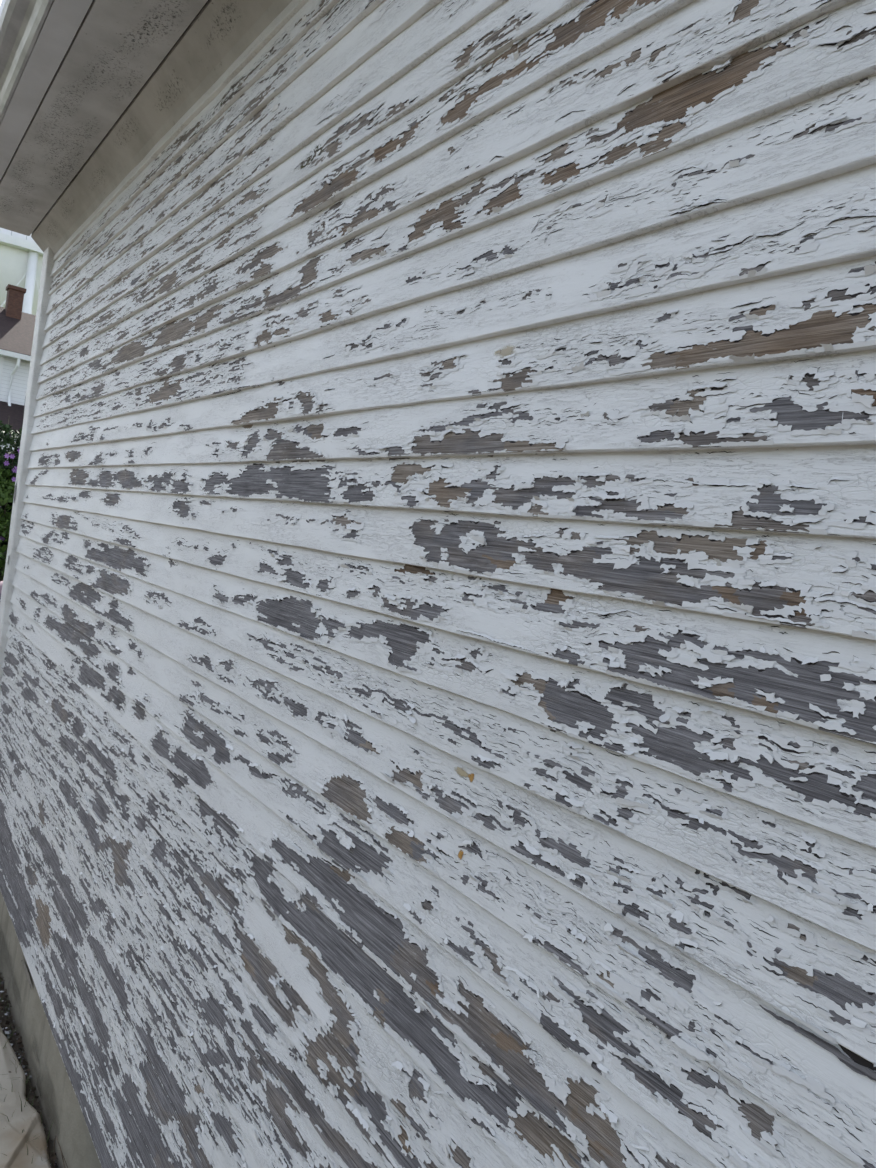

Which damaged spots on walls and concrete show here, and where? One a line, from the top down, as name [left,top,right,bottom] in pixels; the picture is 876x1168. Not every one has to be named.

peeling [29,0,876,822]
peeling [0,512,876,1168]
crack [244,632,876,1154]